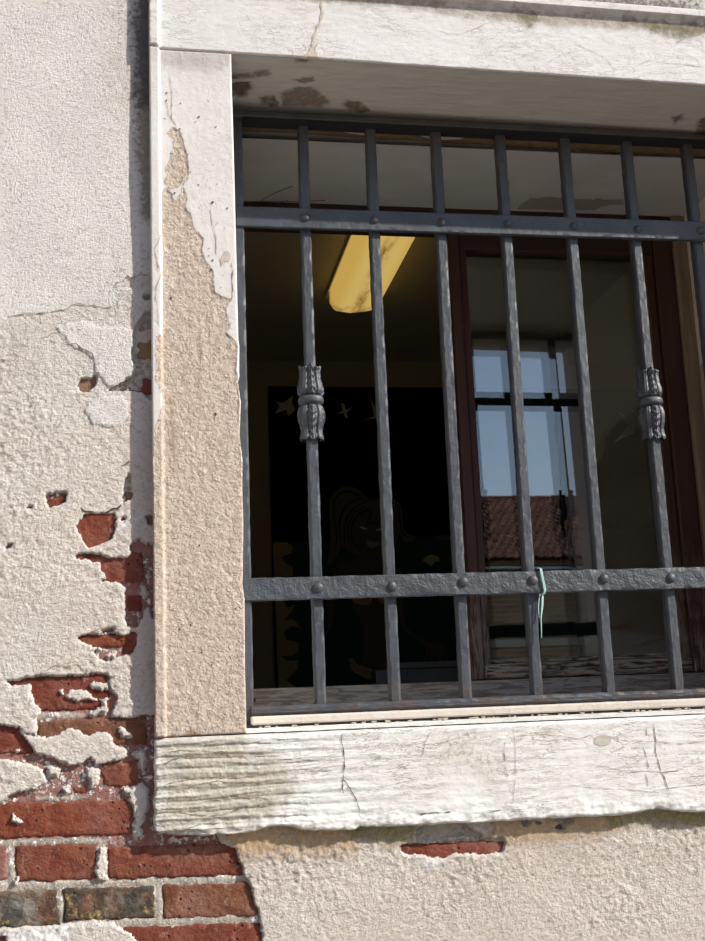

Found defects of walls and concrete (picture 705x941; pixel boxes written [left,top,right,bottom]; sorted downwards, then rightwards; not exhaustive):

crack [304,0,324,60]
peeling [0,118,262,941]
crack [341,734,365,819]
crack [643,728,679,790]
flaking render [400,823,505,858]